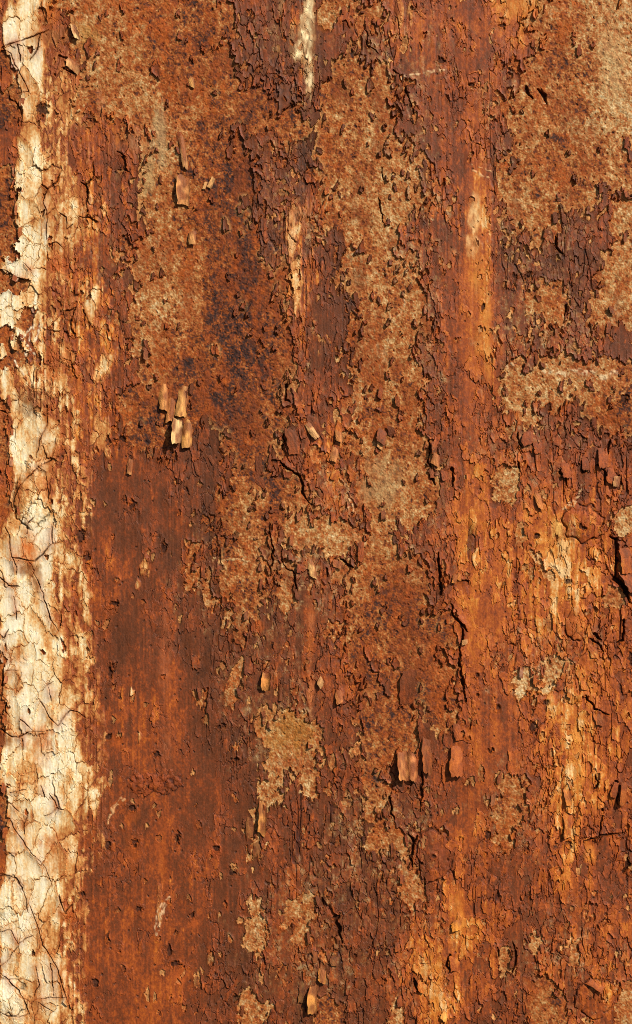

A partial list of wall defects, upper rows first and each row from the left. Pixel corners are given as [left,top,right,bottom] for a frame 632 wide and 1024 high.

crack [1,1,76,127]
peeling [487,0,632,487]
rust [480,307,598,364]
crack [0,405,63,639]
peeling [58,0,480,919]
crack [589,536,631,653]
peeling [602,505,632,610]
crack [0,785,73,1019]
rust [145,934,243,1016]
peeling [243,890,348,1024]
rust [354,944,450,986]
rust [558,866,630,993]